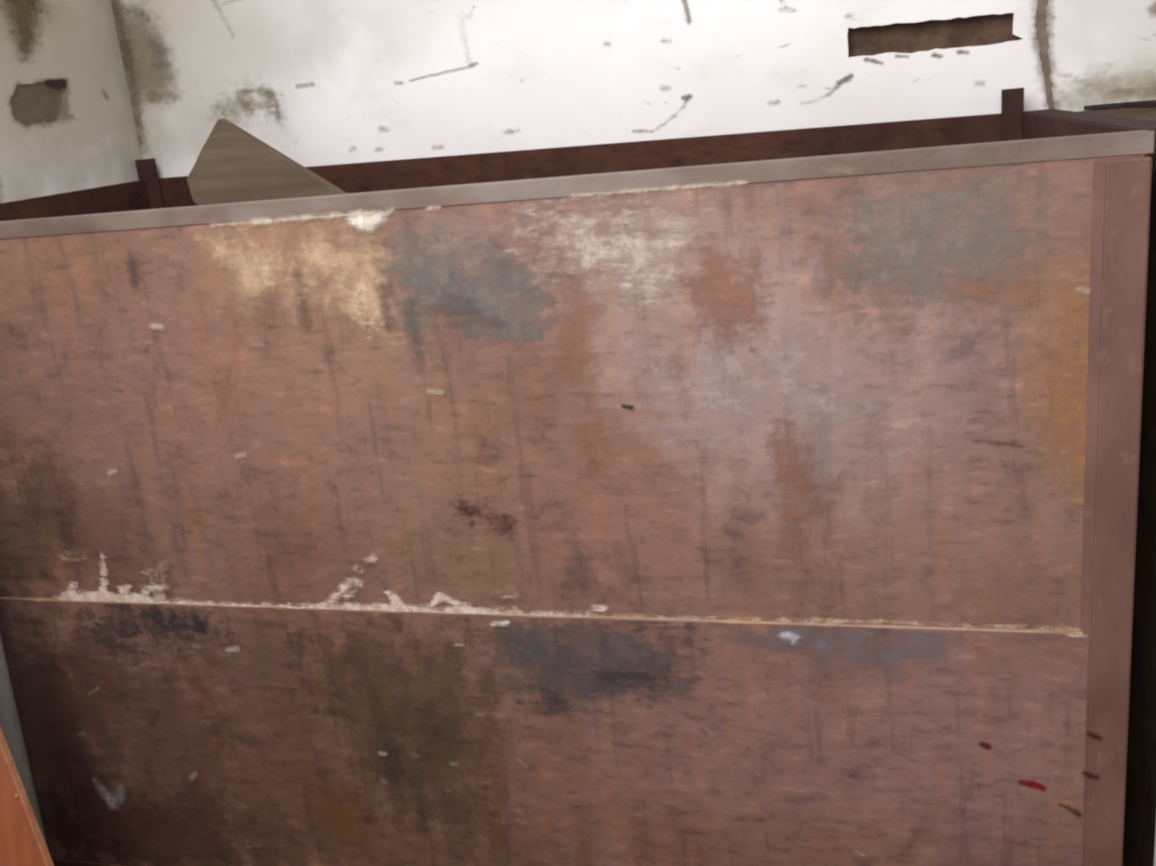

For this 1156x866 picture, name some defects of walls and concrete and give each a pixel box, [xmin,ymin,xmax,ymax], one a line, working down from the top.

leakage [5,0,41,52]
crack [682,0,690,22]
leakage [111,0,172,146]
crack [396,63,478,84]
spalling [10,79,67,126]
leakage [217,89,279,117]